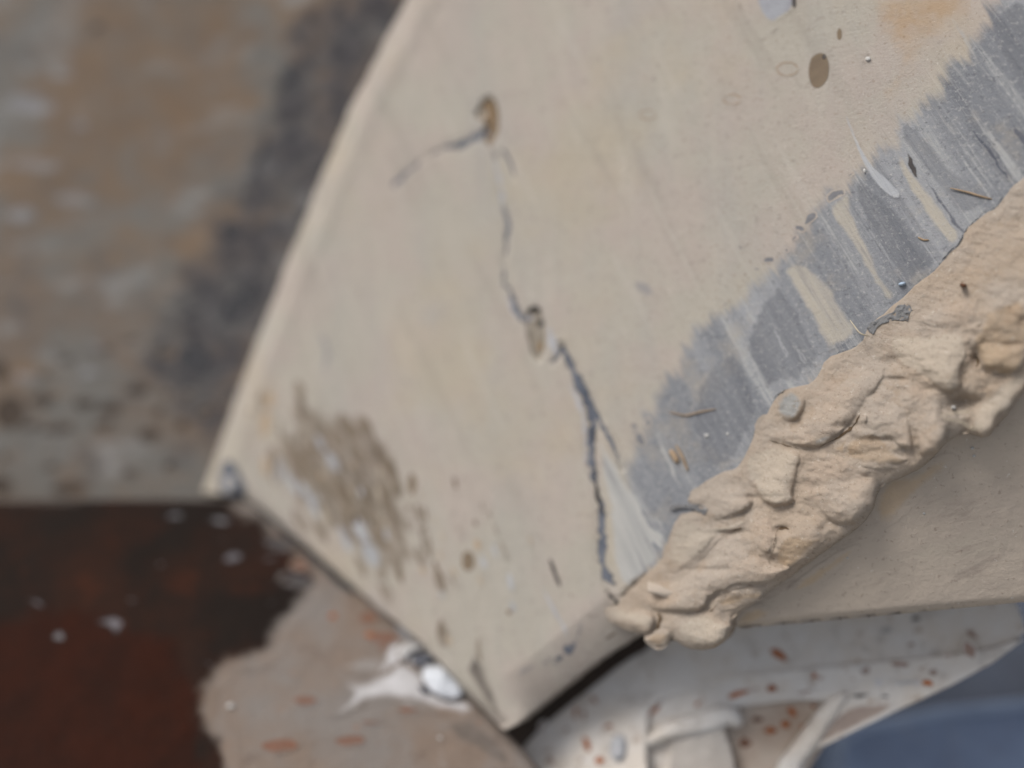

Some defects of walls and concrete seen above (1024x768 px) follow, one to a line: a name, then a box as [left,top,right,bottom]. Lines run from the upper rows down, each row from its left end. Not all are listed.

crack [393,130,638,605]
spalling [826,113,901,203]